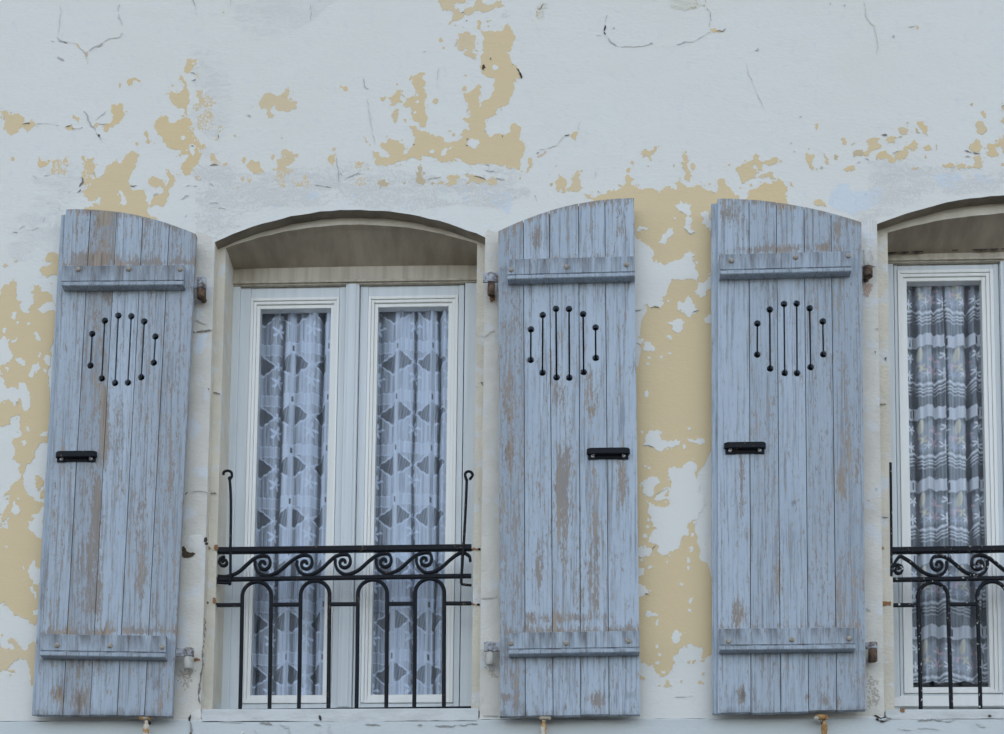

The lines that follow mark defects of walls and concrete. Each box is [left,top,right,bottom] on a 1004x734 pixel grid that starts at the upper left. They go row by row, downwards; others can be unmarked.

crack [51,4,122,63]
peeling [248,86,297,118]
peeling [351,0,546,188]
peeling [81,58,228,220]
peeling [791,121,937,172]
peeling [942,103,1004,171]
peeling [0,252,59,625]
peeling [550,146,794,687]
peeling [0,634,36,686]
crack [188,618,207,734]
crack [222,721,291,734]
crack [872,693,953,731]